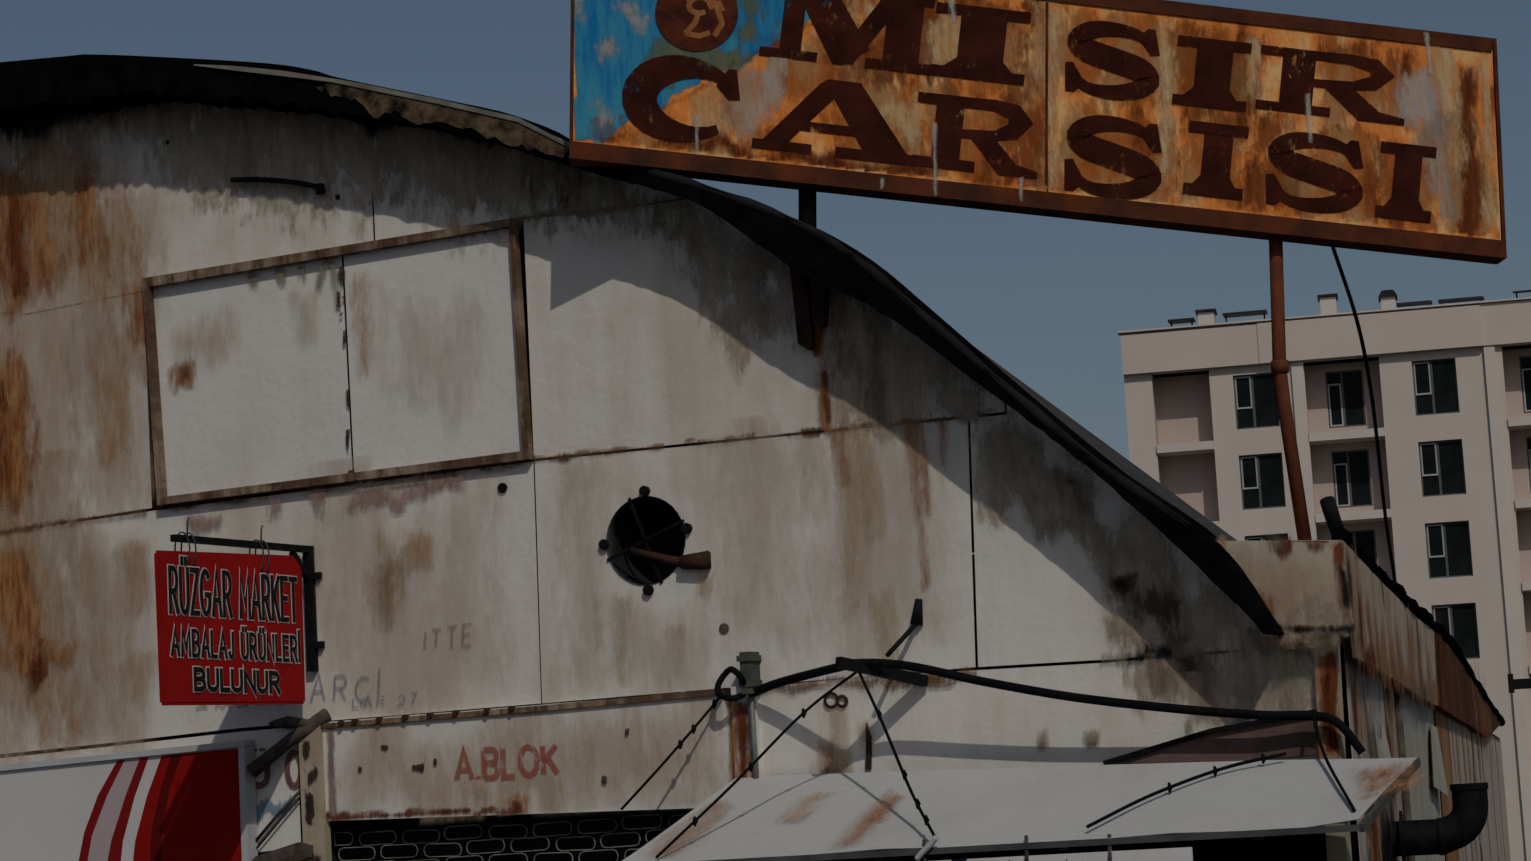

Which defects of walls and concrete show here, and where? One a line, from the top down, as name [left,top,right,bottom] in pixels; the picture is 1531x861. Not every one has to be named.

corrosion [1,173,29,320]
damp [3,101,793,369]
damp [0,167,150,754]
corrosion [0,349,266,743]
corrosion [324,468,461,491]
damp [816,288,1353,726]
corrosion [1261,537,1492,861]